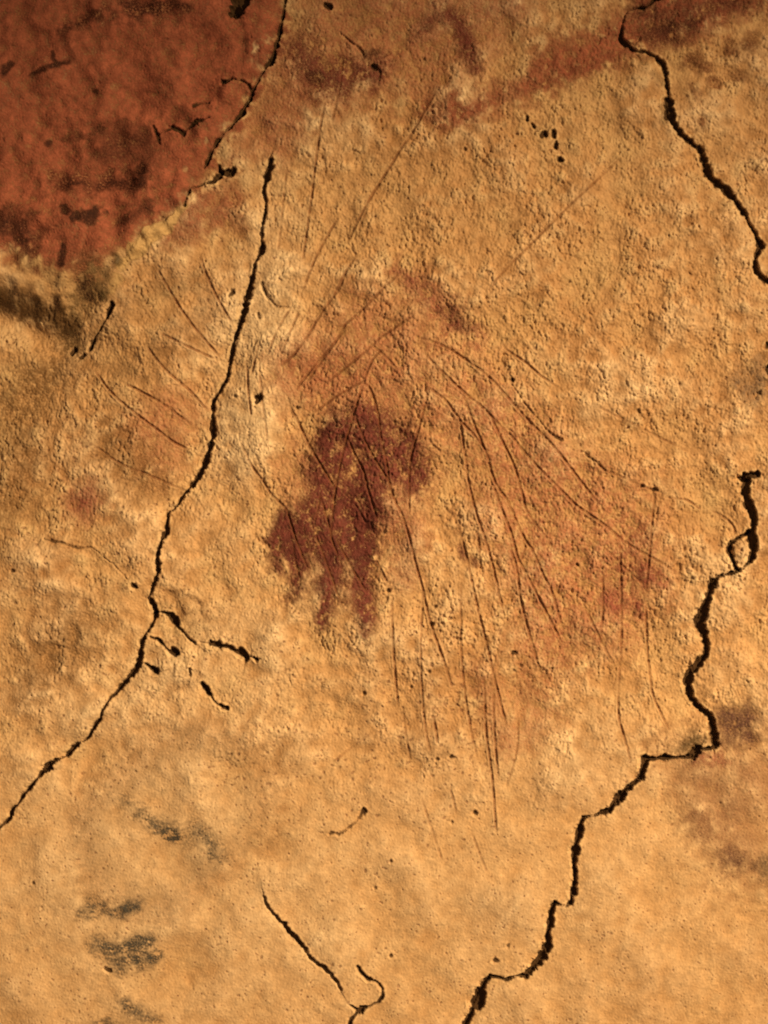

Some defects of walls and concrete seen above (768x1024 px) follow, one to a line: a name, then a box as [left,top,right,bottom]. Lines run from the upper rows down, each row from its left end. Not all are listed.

crack [153,0,286,207]
crack [618,28,768,284]
crack [0,158,274,827]
crack [462,470,760,1024]
crack [264,896,384,1024]